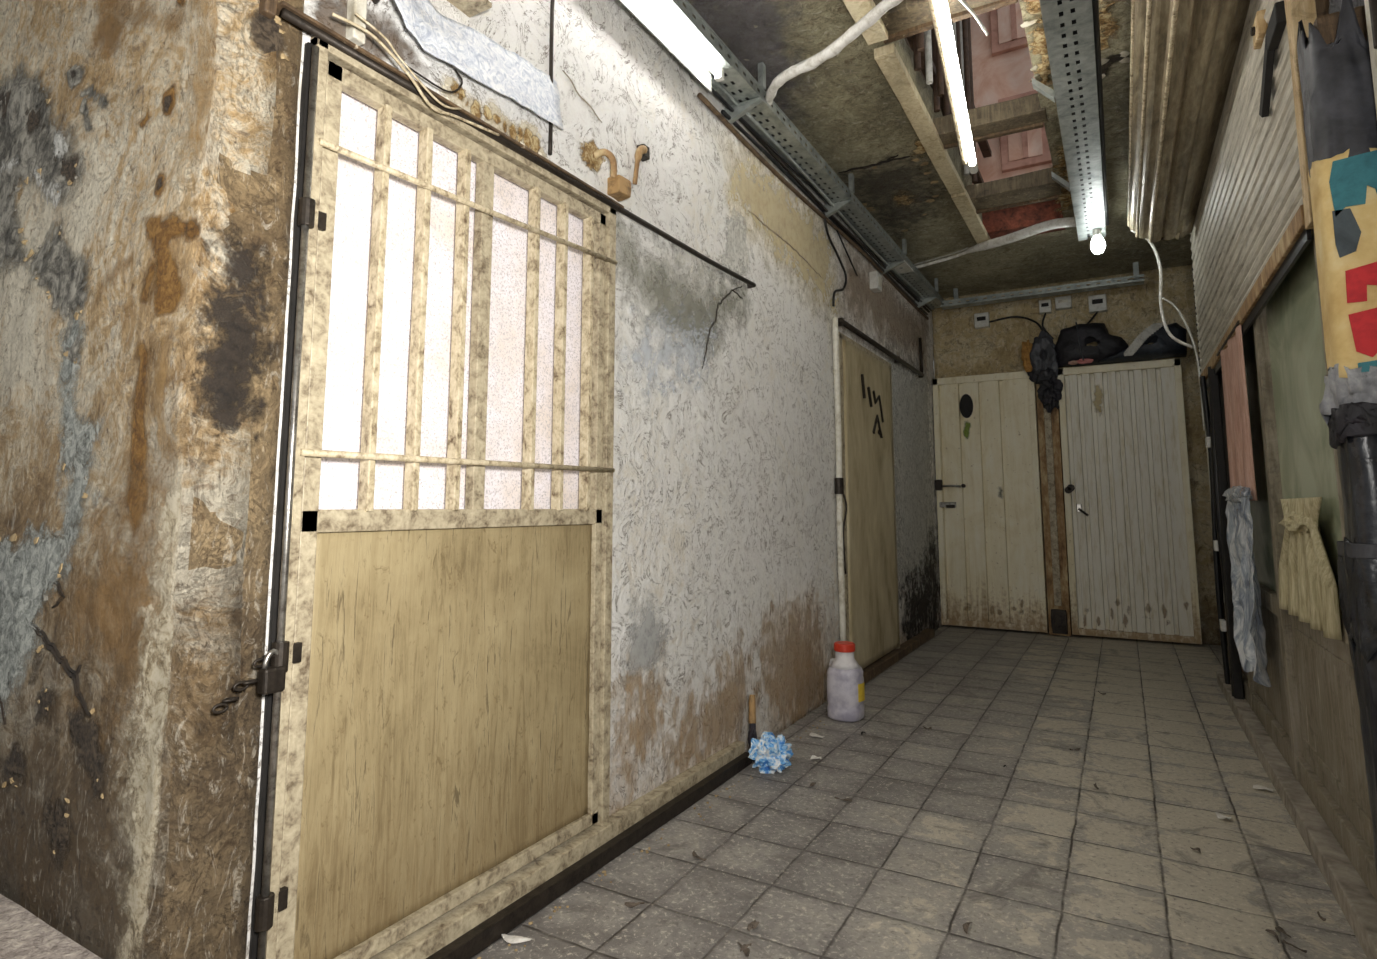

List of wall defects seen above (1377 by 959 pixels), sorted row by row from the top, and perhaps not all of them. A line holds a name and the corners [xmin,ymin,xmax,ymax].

flaking render [0,63,109,726]
damp [193,226,279,445]
crack [0,581,92,725]
damp [899,521,940,641]